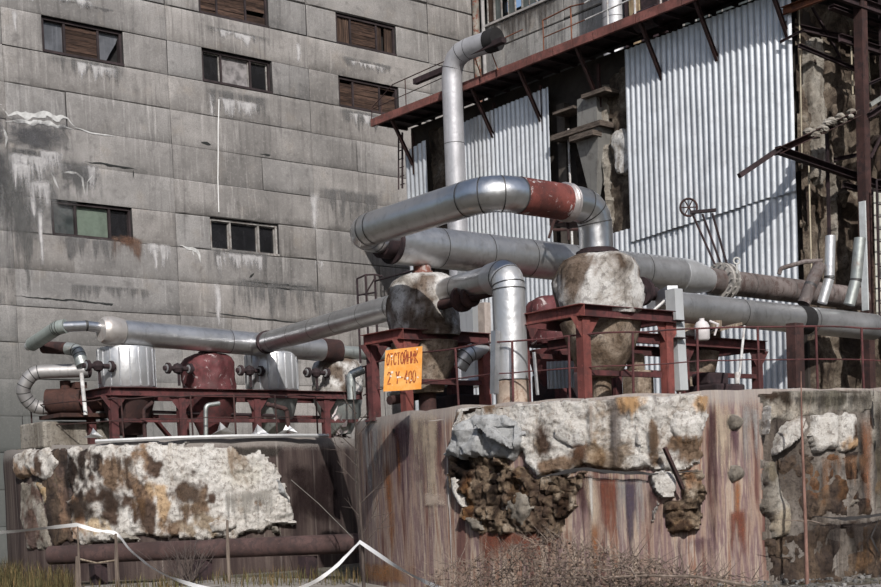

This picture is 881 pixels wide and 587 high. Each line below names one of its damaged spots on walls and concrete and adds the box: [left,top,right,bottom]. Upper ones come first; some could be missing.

leakage [0,104,112,277]
spalling [13,447,58,505]
spalling [66,441,297,545]
spalling [447,392,709,539]
rust [592,479,617,572]
rust [649,426,657,451]
rust [731,485,745,544]
spalling [758,390,881,585]